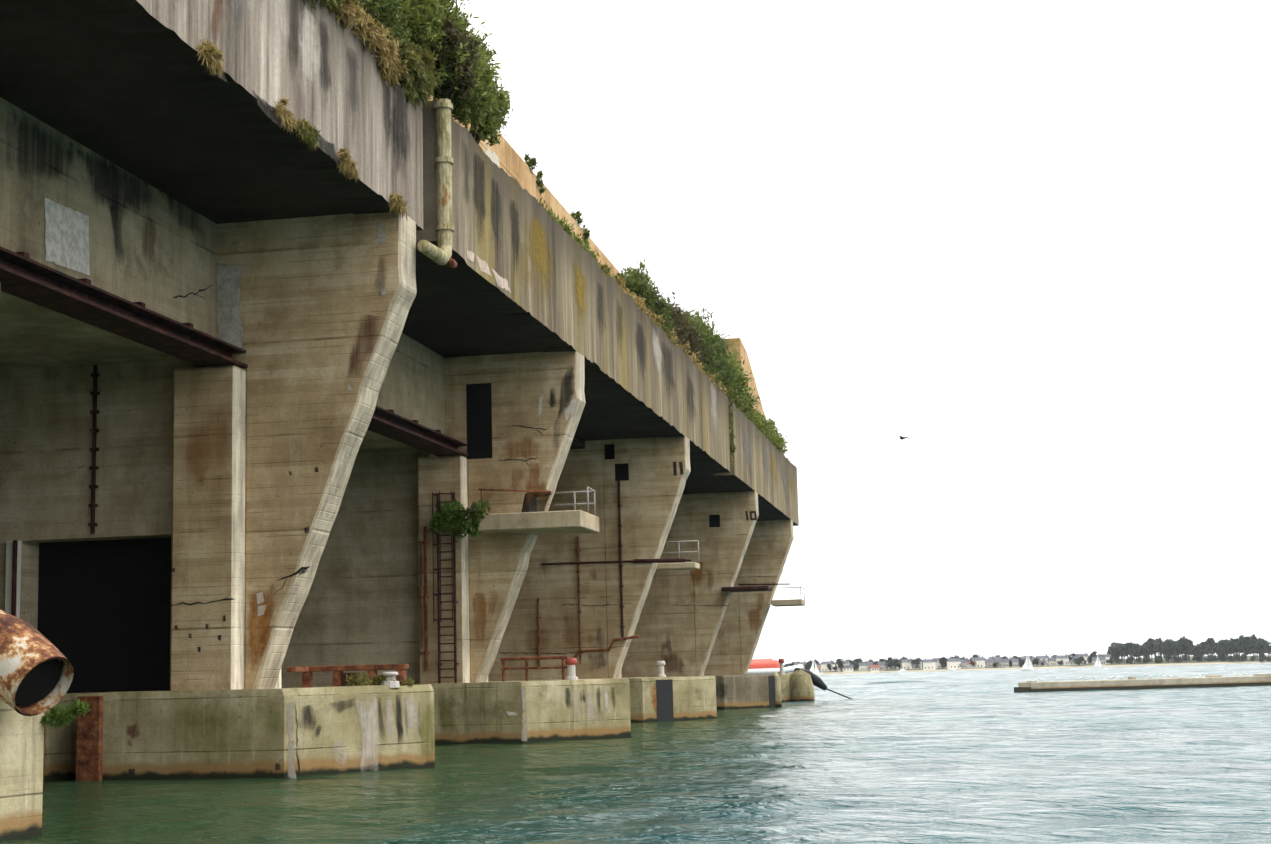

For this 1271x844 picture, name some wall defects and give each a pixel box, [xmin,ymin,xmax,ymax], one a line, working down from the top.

damp [474,156,552,279]
damp [550,368,573,415]
damp [637,326,673,384]
rust [250,586,274,663]